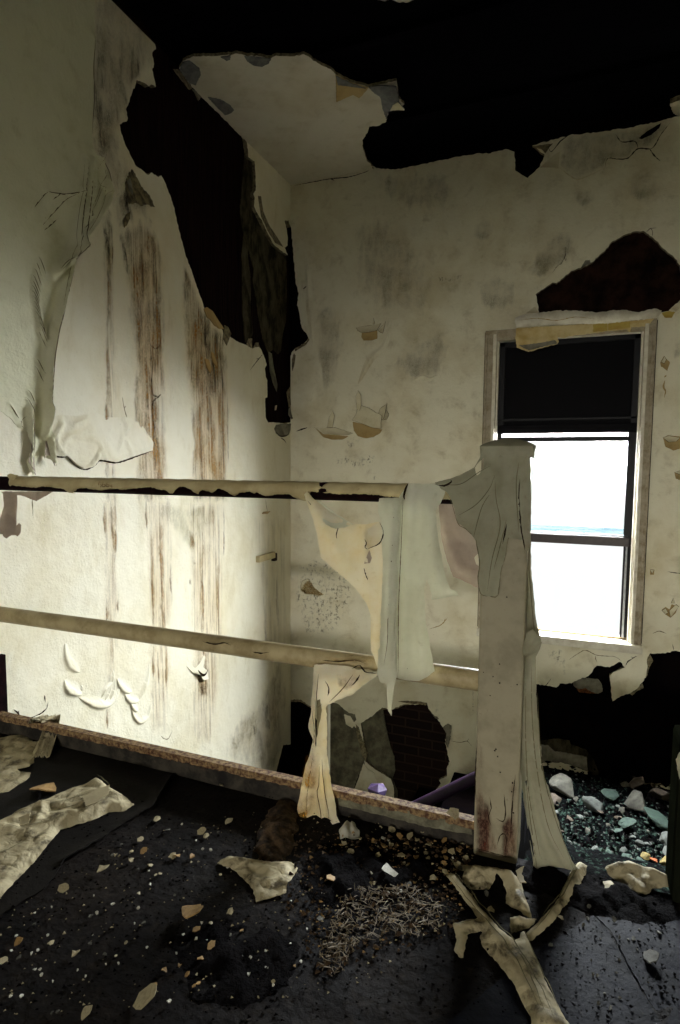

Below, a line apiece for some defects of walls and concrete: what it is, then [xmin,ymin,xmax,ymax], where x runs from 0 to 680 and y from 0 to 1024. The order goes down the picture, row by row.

peeling [335,74,404,119]
spalling [371,105,677,180]
peeling [0,0,115,476]
spalling [115,2,309,423]
spalling [515,233,680,352]
leakage [104,229,164,479]
leakage [185,274,225,480]
peeling [314,391,389,440]
rust [0,711,303,789]
spalling [276,446,680,1024]
rust [331,784,489,852]